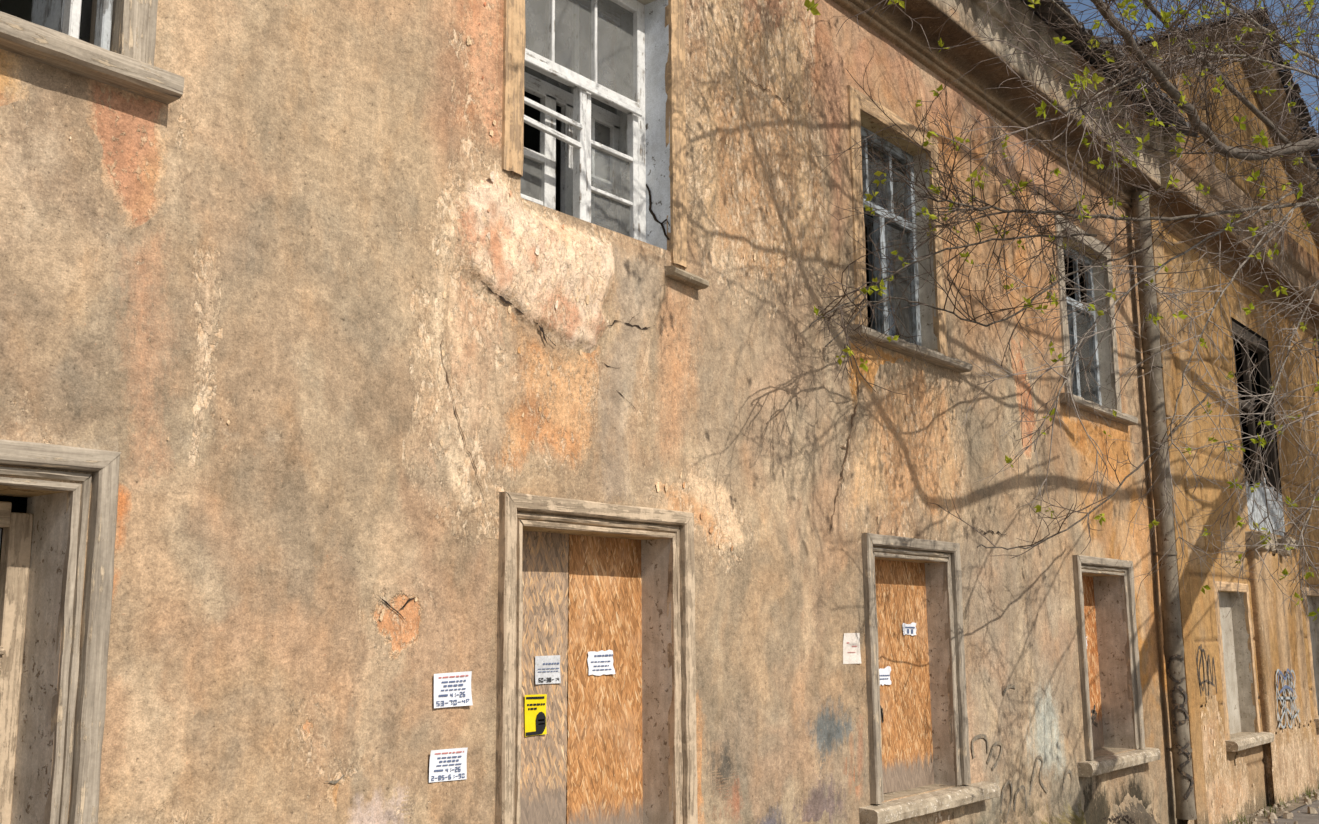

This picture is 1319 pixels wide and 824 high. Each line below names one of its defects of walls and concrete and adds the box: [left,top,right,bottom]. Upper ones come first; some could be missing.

peeling [0,49,182,230]
crack [470,272,556,346]
peeling [396,0,854,568]
peeling [0,465,100,512]
peeling [0,382,119,452]
peeling [167,391,302,493]
crack [830,350,859,533]